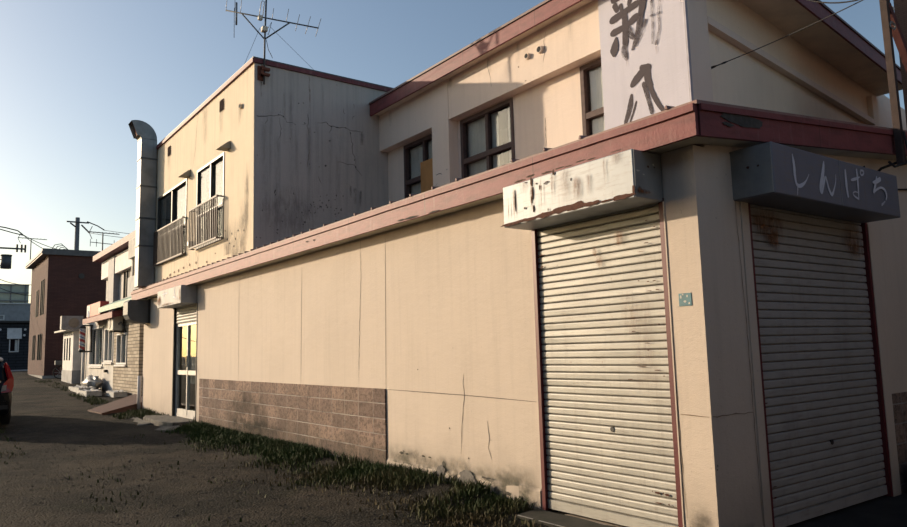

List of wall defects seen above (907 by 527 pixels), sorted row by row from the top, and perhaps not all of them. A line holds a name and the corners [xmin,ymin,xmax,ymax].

peeling [514,157,596,212]